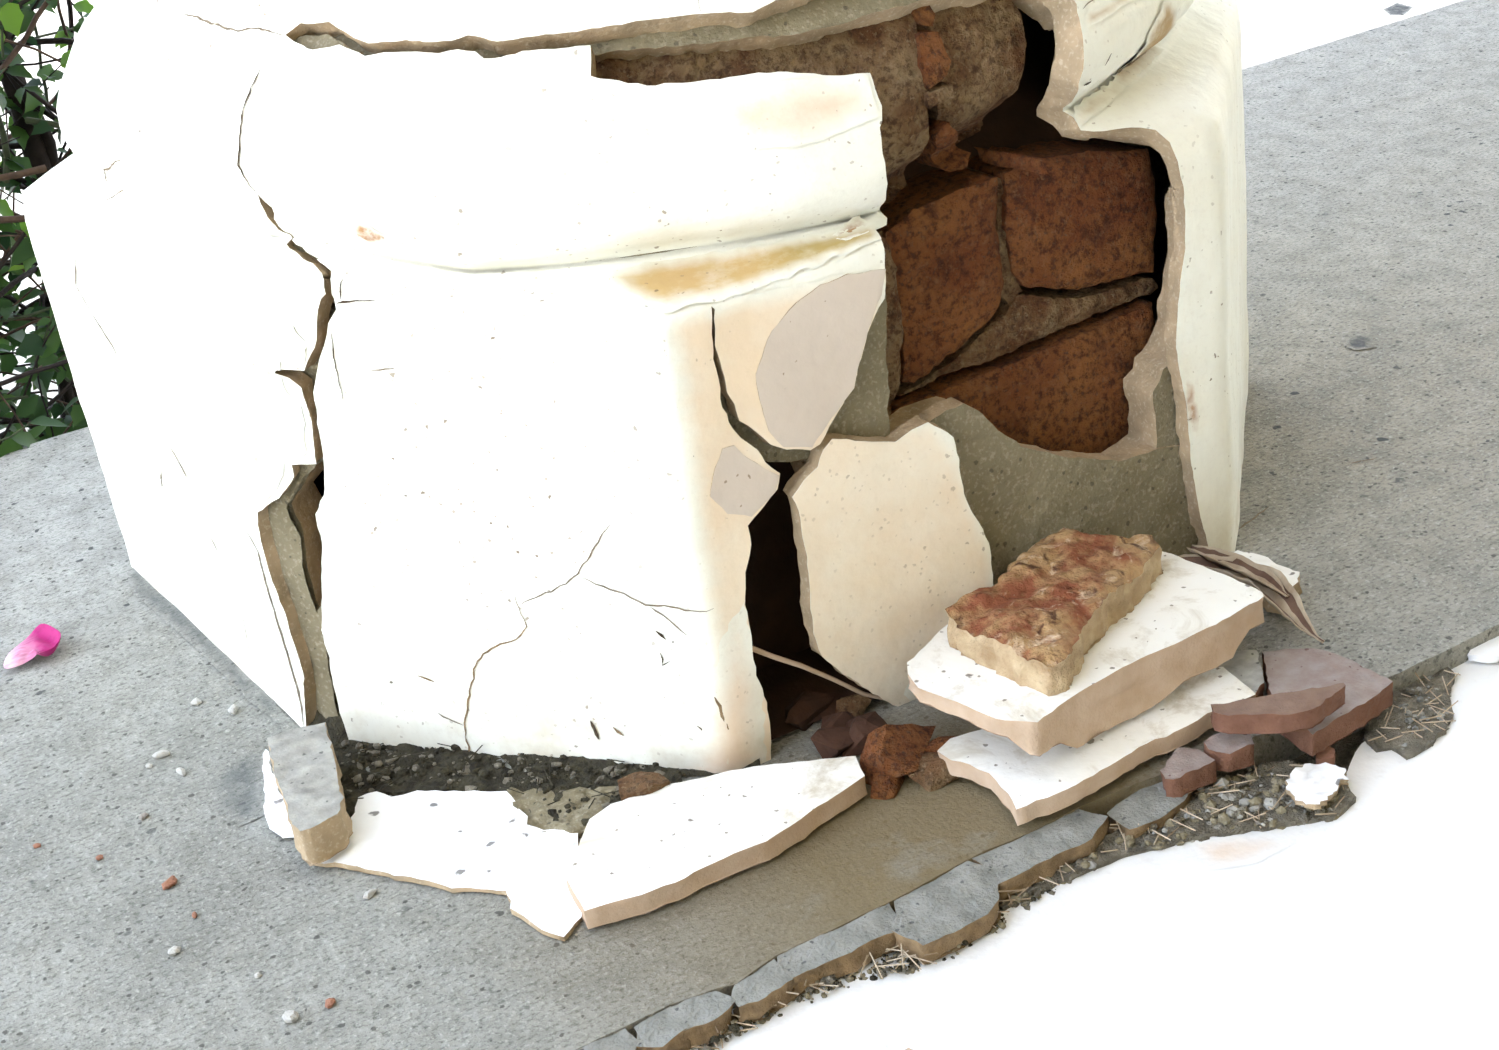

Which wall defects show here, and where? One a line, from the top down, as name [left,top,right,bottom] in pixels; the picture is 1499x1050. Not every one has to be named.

spalling [596,0,1198,586]
spalling [268,463,338,719]
crack [438,525,714,752]